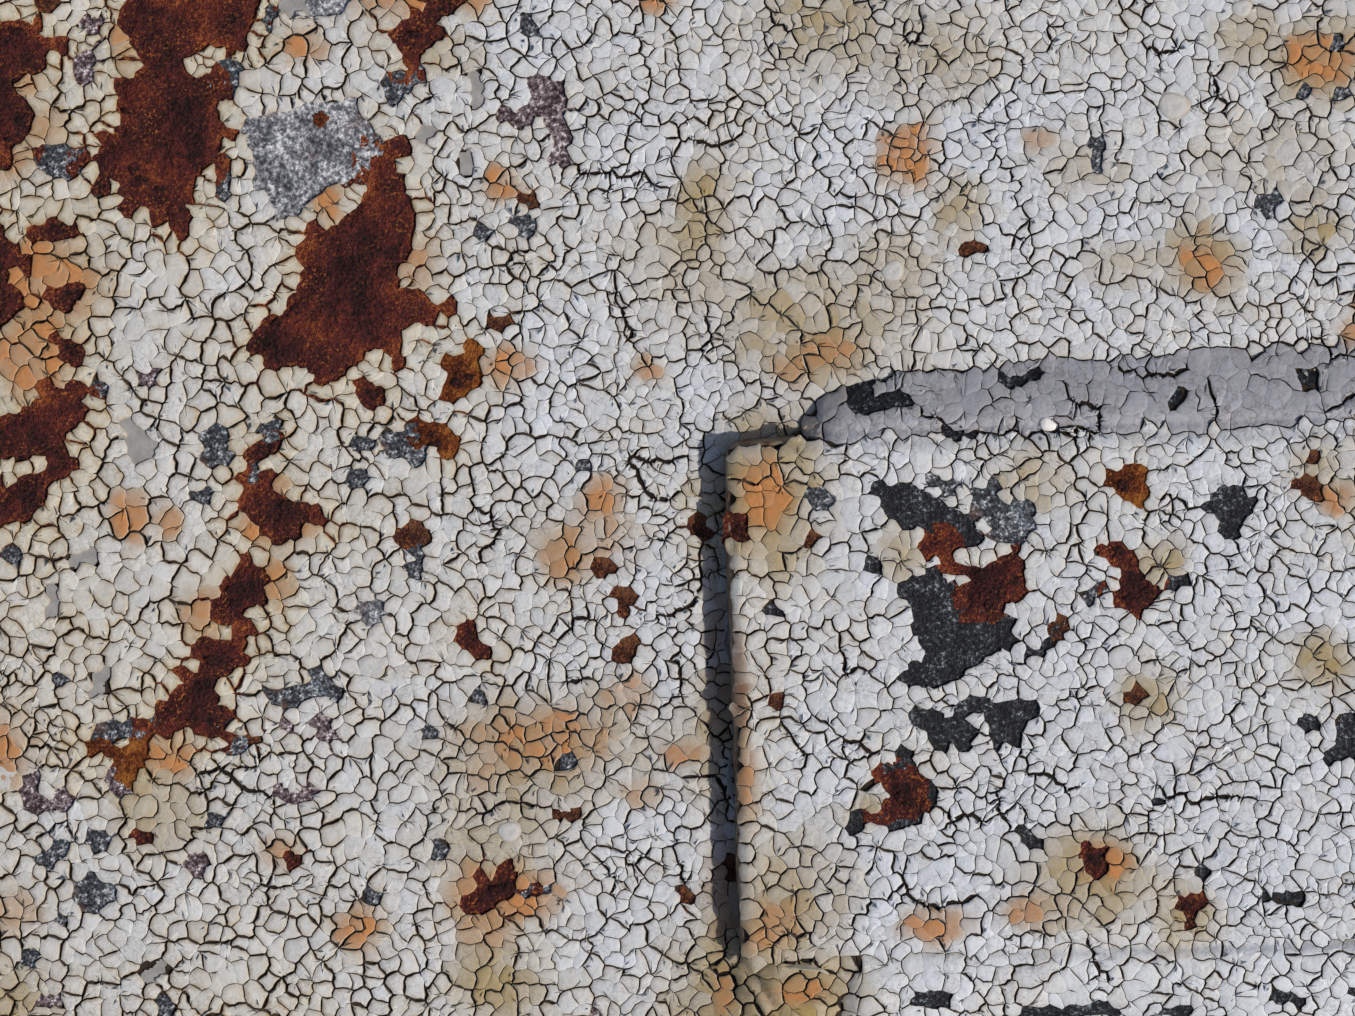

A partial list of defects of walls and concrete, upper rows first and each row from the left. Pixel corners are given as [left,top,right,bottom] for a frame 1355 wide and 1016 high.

rust [65,0,323,258]
peeling [207,56,426,226]
rust [0,205,111,556]
rust [81,430,346,789]
rust [228,125,535,471]
crack [443,465,474,517]
peeling [869,470,1048,555]
peeling [844,565,1074,841]
crack [953,518,1012,568]
peeling [1296,711,1355,772]
crack [0,759,232,1016]
crack [61,789,371,1016]